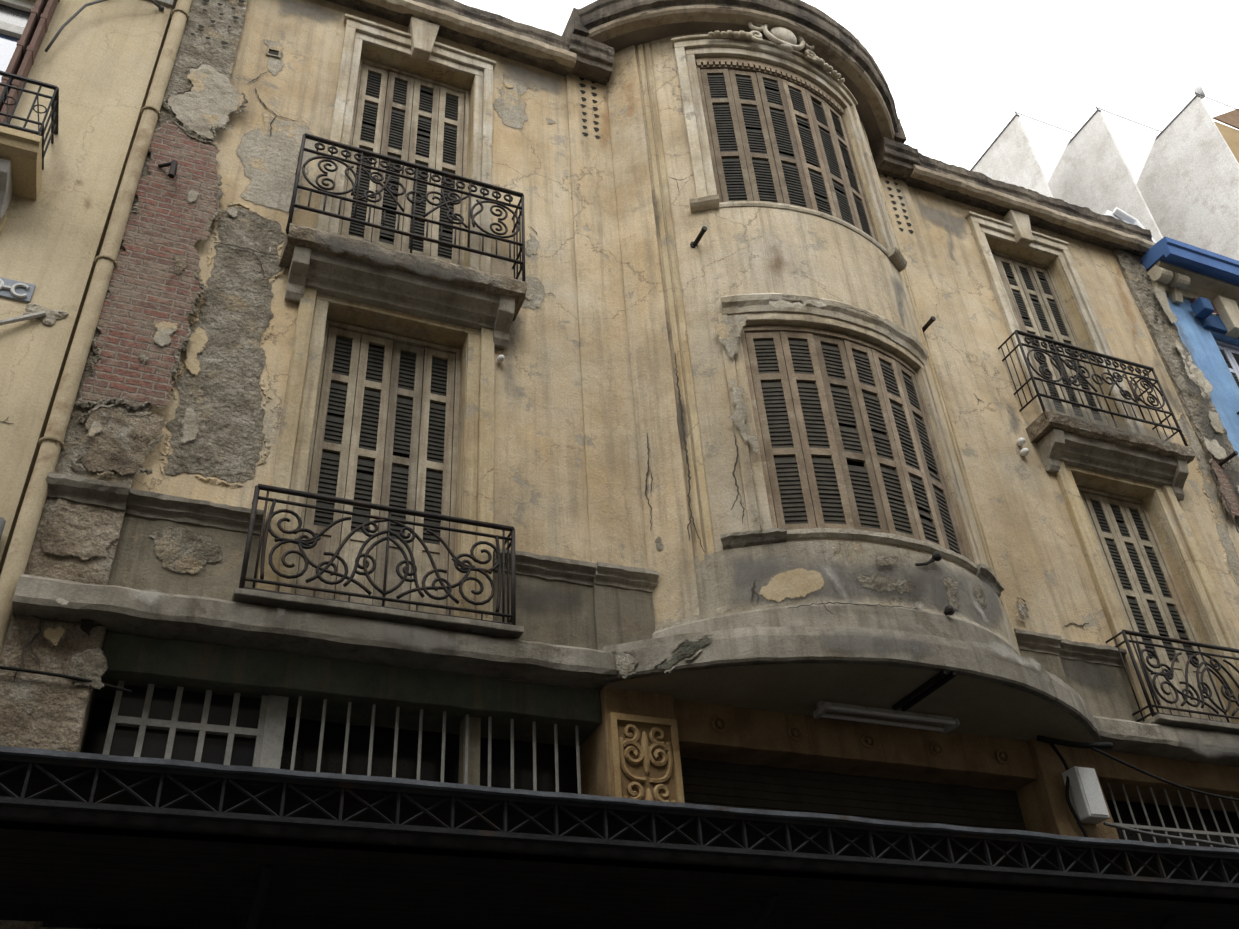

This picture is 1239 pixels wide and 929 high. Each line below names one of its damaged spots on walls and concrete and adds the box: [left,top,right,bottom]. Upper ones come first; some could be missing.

hole [263,39,285,75]
flaking render [71,61,317,489]
spalling [1154,286,1178,323]
crack [645,433,653,529]
crack [675,354,705,552]
crack [731,435,745,524]
peeling [1175,340,1239,586]
spalling [40,498,120,560]
spalling [148,525,223,574]
peeling [759,568,824,602]
spalling [68,619,108,689]
spalling [611,633,713,680]